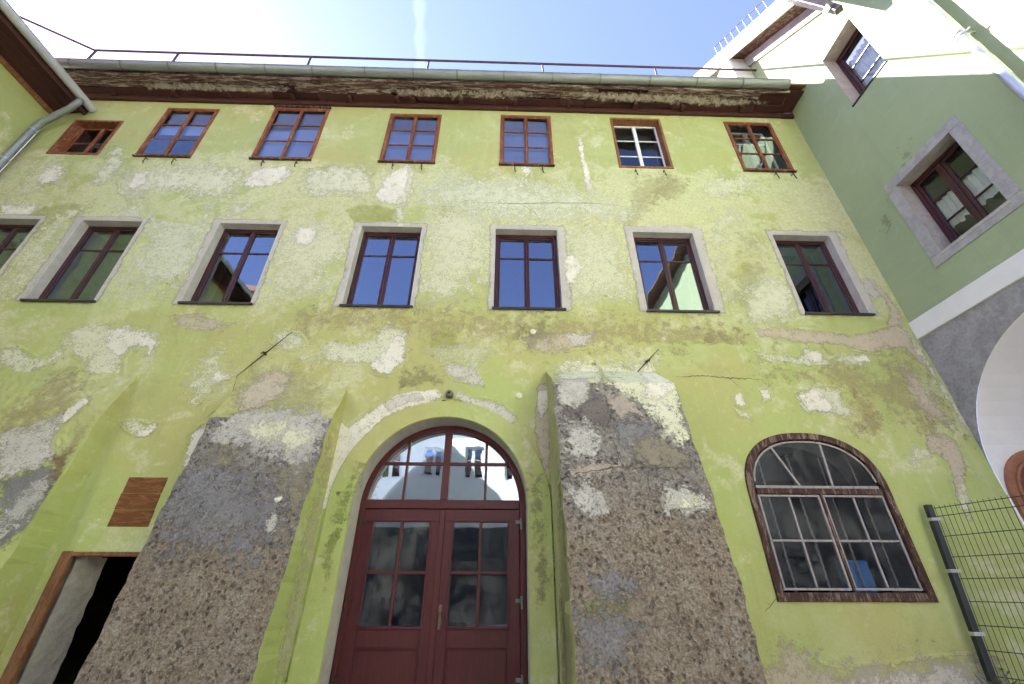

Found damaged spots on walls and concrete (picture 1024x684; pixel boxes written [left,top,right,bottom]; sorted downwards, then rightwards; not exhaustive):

peeling [141,81,290,93]
peeling [391,87,537,100]
peeling [562,91,768,107]
peeling [0,144,374,303]
flaking render [0,323,164,373]
flaking render [266,320,411,379]
crack [676,375,759,385]
flaking render [740,275,973,521]
peeling [517,331,694,528]
flaking render [0,397,89,551]
spalling [149,340,520,684]
peeling [660,484,714,519]